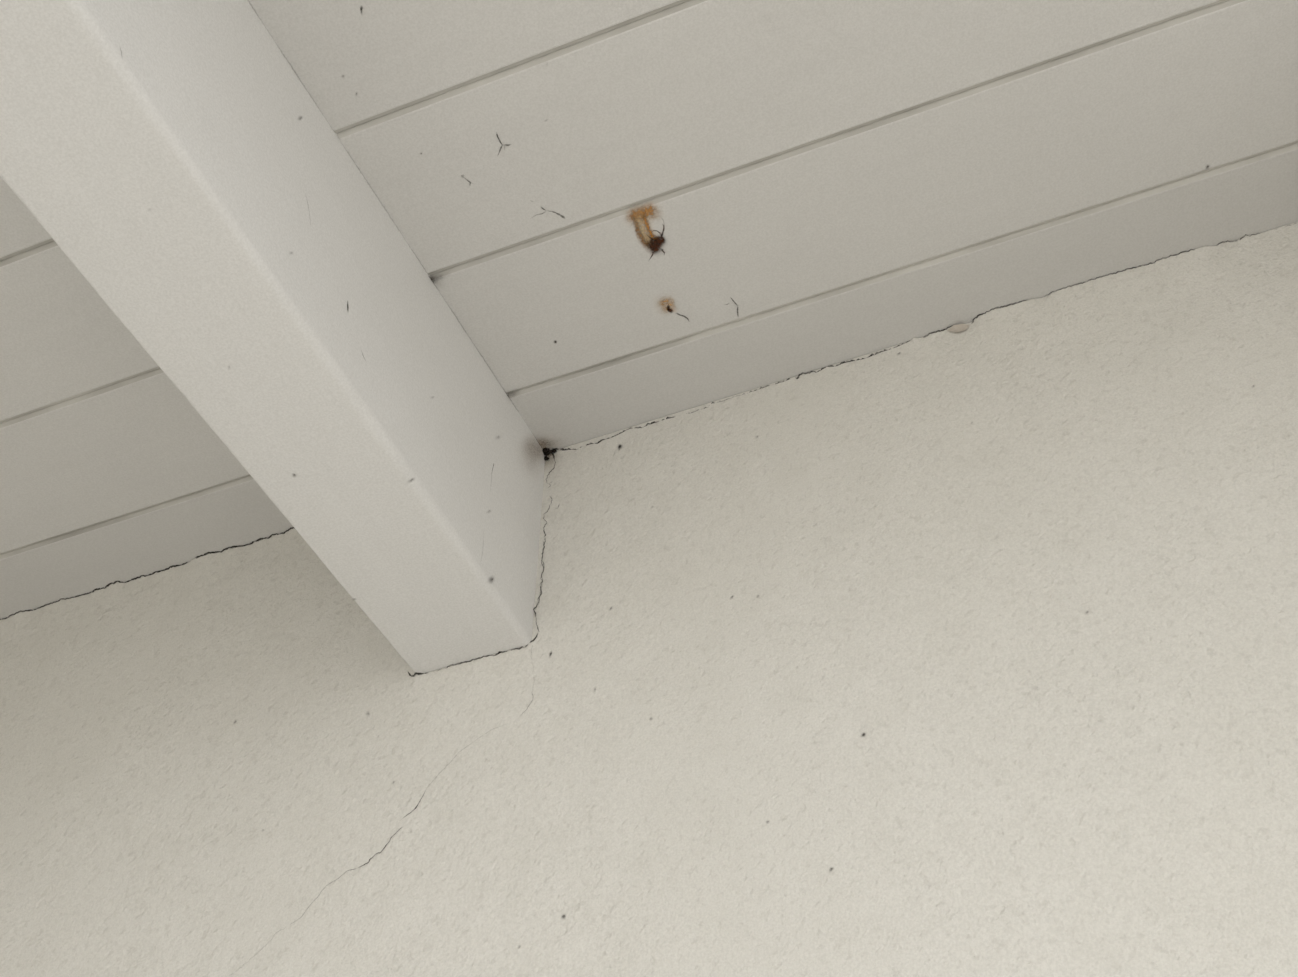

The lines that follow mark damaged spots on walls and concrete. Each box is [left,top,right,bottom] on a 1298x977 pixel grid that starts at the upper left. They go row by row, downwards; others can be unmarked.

rust [629,205,665,260]
crack [408,234,1254,677]
crack [0,527,294,620]